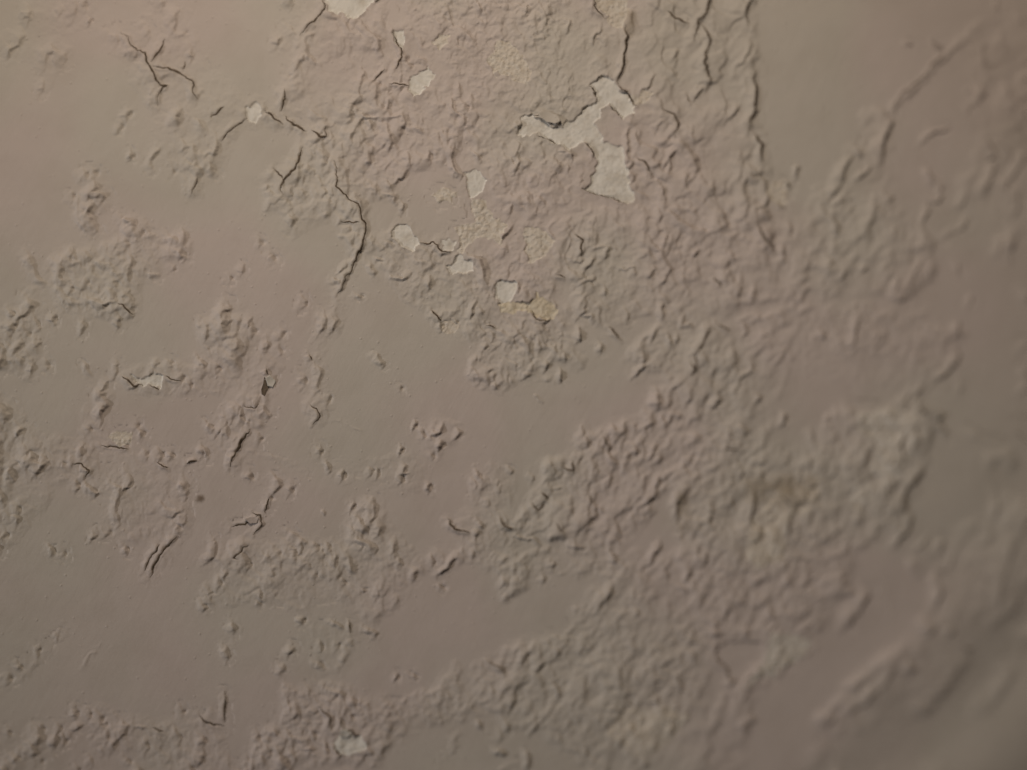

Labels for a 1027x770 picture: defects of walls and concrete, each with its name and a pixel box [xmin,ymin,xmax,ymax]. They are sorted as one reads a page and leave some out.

spalling [325,0,374,19]
crack [612,19,635,92]
crack [383,77,411,91]
spalling [408,67,435,97]
crack [656,0,771,173]
spalling [518,75,654,204]
spalling [391,224,420,252]
flaking render [432,169,508,275]
crack [749,218,783,262]
flaking render [495,280,558,320]
flaking render [744,477,822,570]
spalling [334,728,367,756]